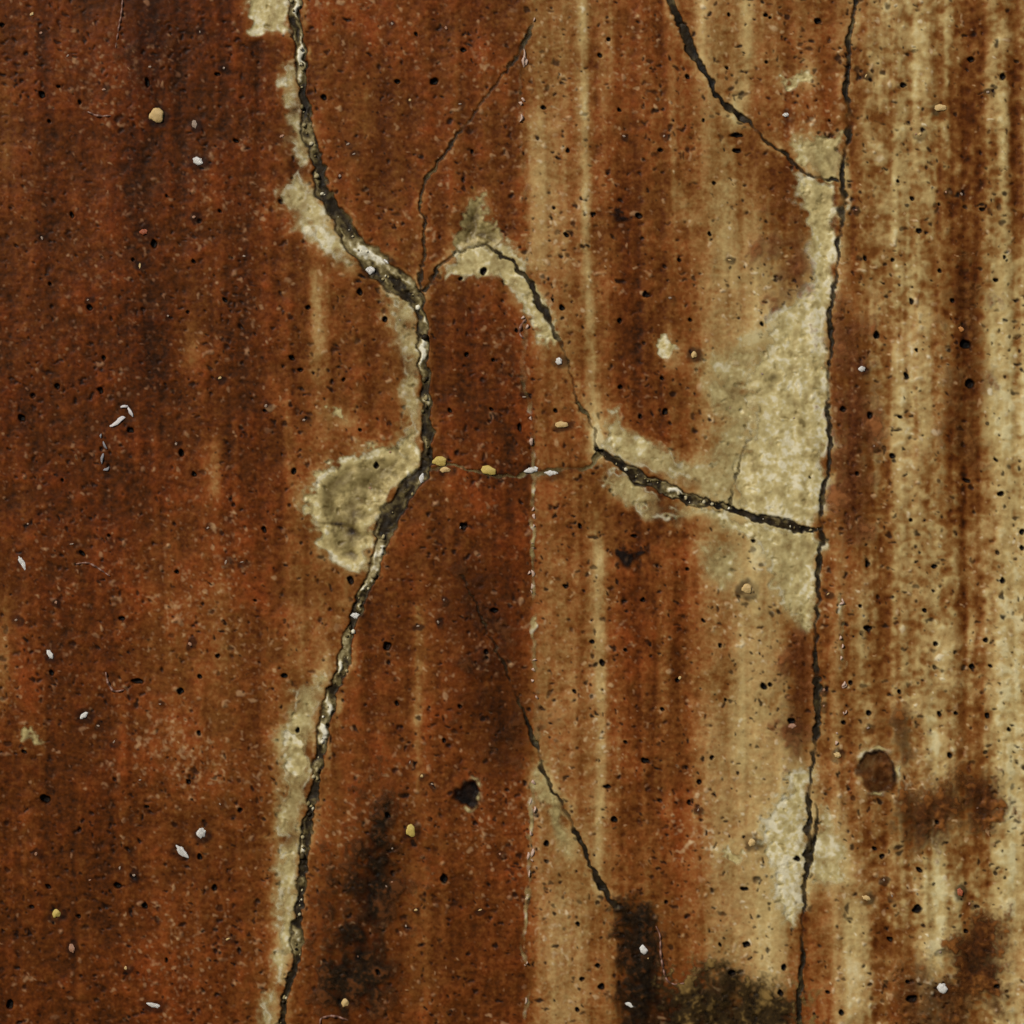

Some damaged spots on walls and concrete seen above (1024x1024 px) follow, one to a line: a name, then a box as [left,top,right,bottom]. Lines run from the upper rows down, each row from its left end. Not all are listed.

crack [279,0,858,1024]
corrosion [825,392,886,520]
corrosion [891,771,1008,853]
water stain [615,926,819,1024]
corrosion [892,908,1010,1024]